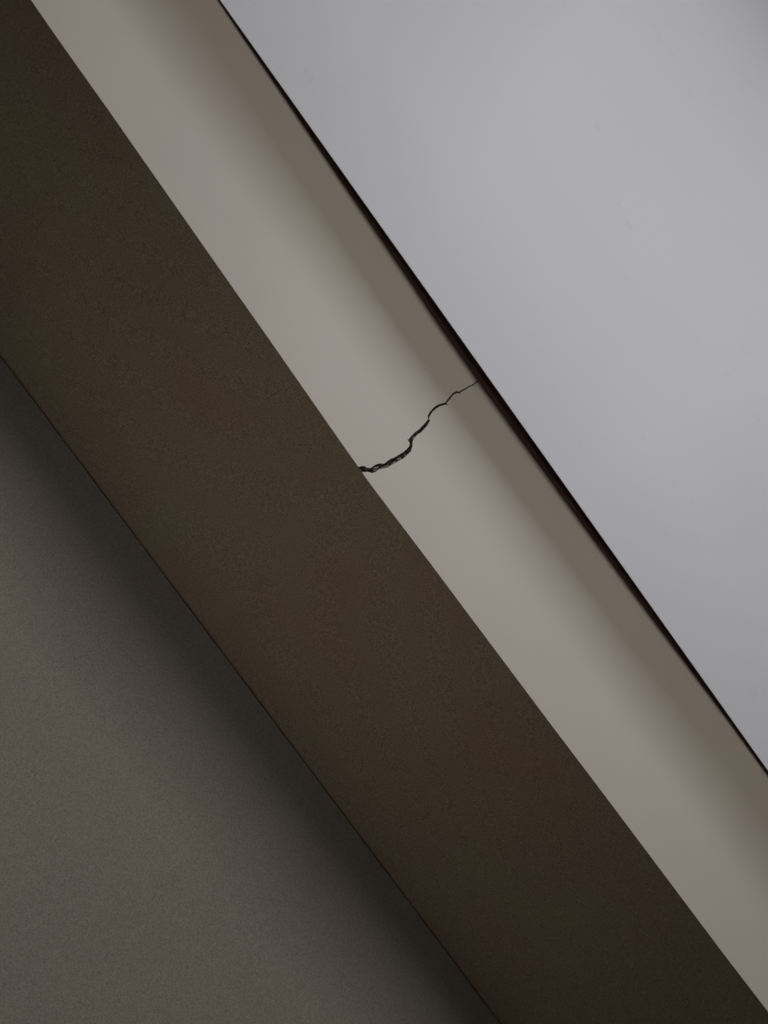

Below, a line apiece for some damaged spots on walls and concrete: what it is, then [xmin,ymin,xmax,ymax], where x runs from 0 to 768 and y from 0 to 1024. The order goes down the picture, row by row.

crack [359,381,477,473]